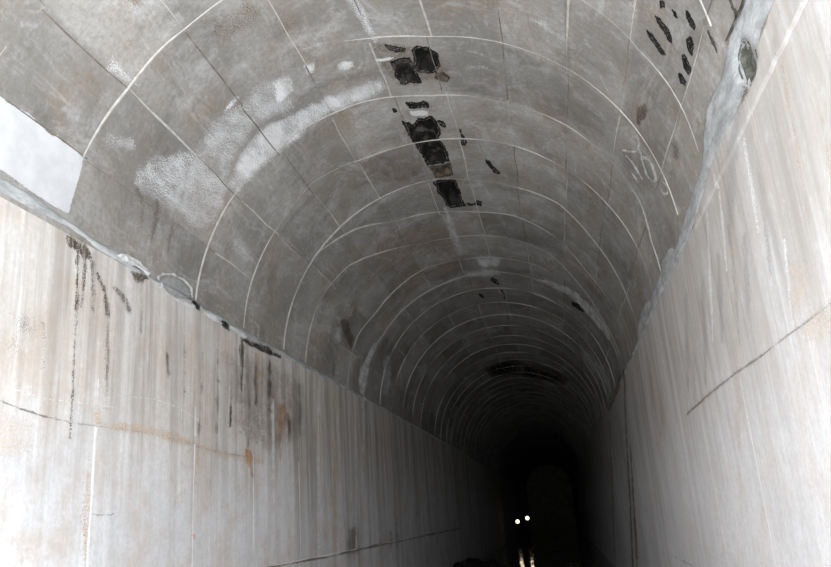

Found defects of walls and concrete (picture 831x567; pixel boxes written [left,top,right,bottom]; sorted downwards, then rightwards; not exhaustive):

leakage [107,53,142,88]
spalling [371,42,450,87]
spalling [646,0,696,86]
spalling [738,36,758,107]
spalling [402,100,482,208]
leakage [130,270,150,299]
leakage [66,235,131,439]
leakage [216,337,320,567]